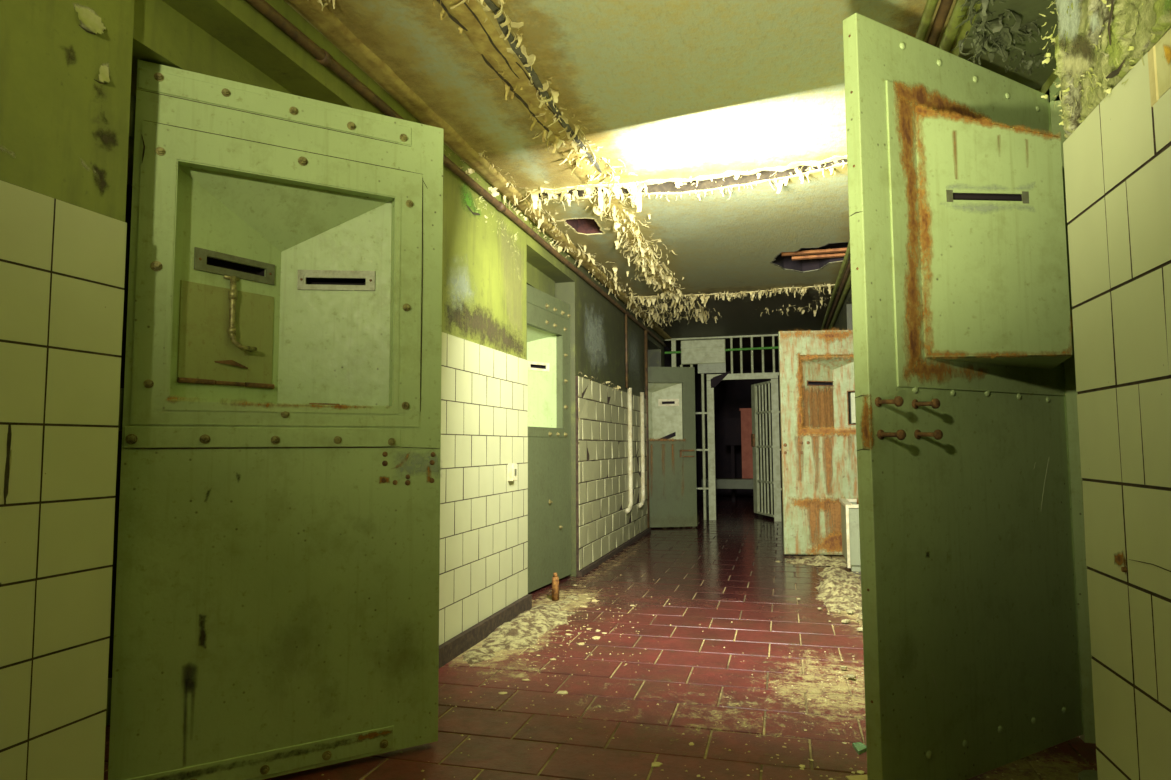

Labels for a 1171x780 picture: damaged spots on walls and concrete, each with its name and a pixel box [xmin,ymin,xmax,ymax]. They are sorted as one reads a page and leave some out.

peeling [74,4,106,35]
peeling [94,64,110,84]
peeling [433,0,850,328]
rust [895,82,1058,382]
damp [1059,36,1092,59]
rust [780,329,874,554]